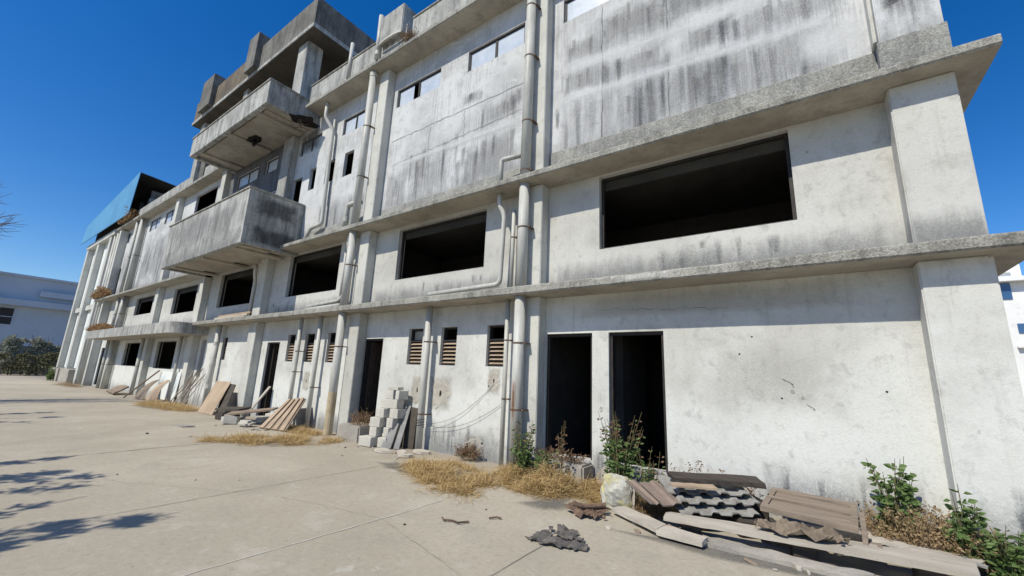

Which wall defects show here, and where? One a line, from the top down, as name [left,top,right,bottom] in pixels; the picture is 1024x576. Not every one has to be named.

leakage [566,40,808,141]
leakage [256,228,290,247]